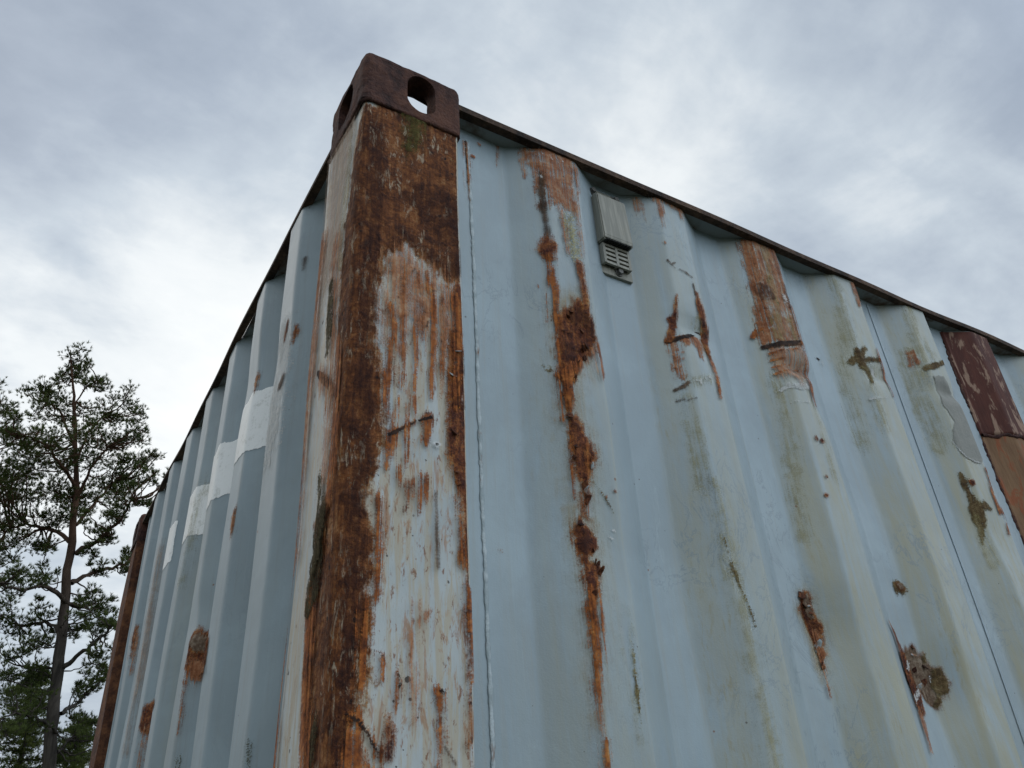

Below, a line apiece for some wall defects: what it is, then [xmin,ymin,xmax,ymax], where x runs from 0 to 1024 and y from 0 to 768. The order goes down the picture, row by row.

rust [664,291,723,399]
rust [735,239,817,407]
rust [284,103,474,768]
rust [517,147,612,768]
peeling [934,375,984,464]
rust [957,468,1011,545]
rust [136,700,154,768]
rust [176,628,209,735]
rust [798,590,832,698]